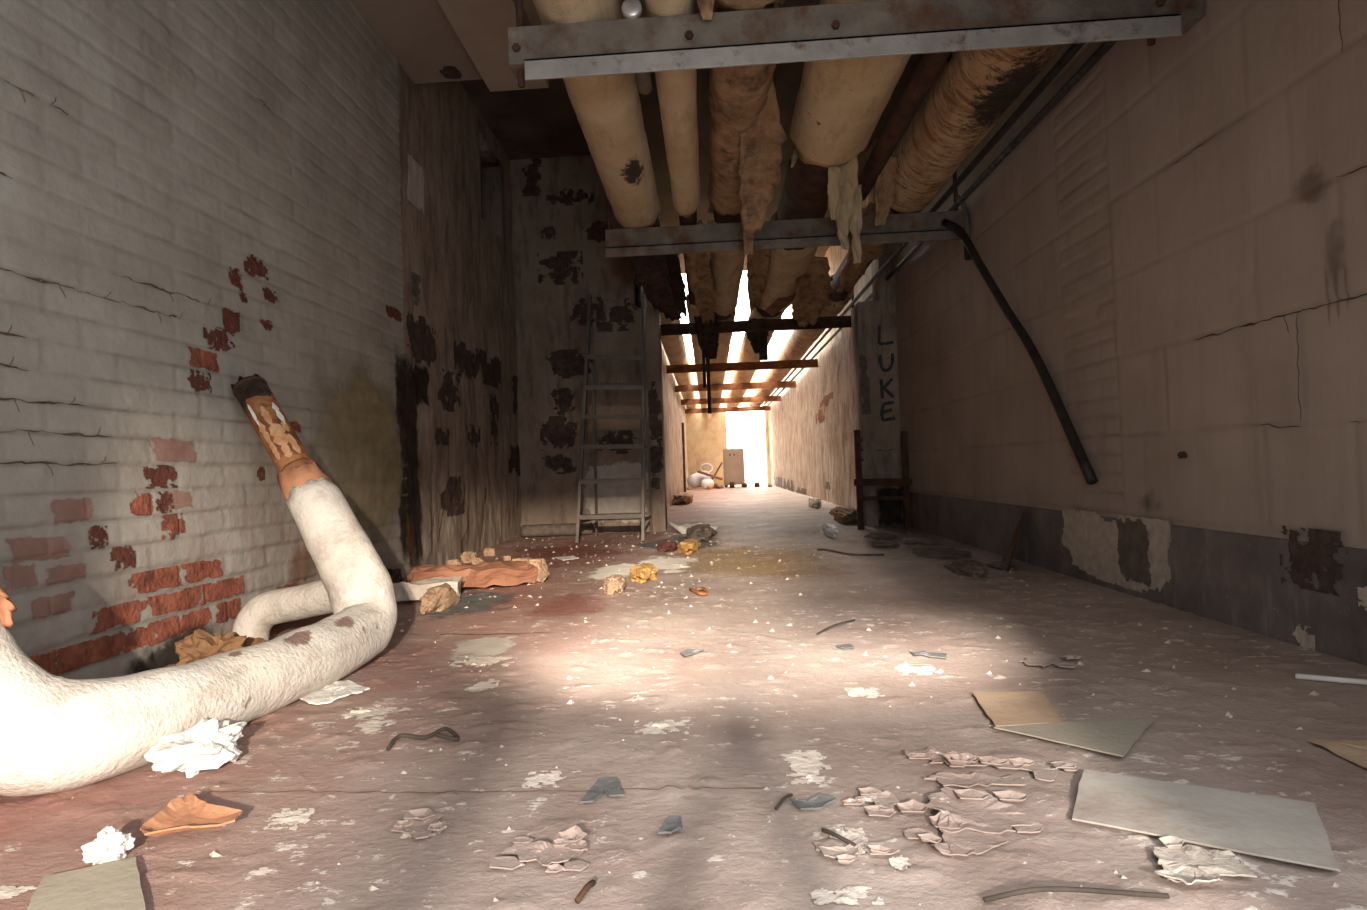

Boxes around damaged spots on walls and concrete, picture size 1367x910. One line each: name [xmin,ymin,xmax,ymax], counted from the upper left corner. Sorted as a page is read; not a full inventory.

leakage [406,150,425,215]
peeling [187,254,278,394]
crack [1193,293,1367,428]
peeling [130,437,197,539]
leakage [583,460,652,524]
peeling [3,498,245,675]
peeling [1062,508,1171,593]
peeling [1280,525,1348,596]
peeling [1357,586,1367,611]